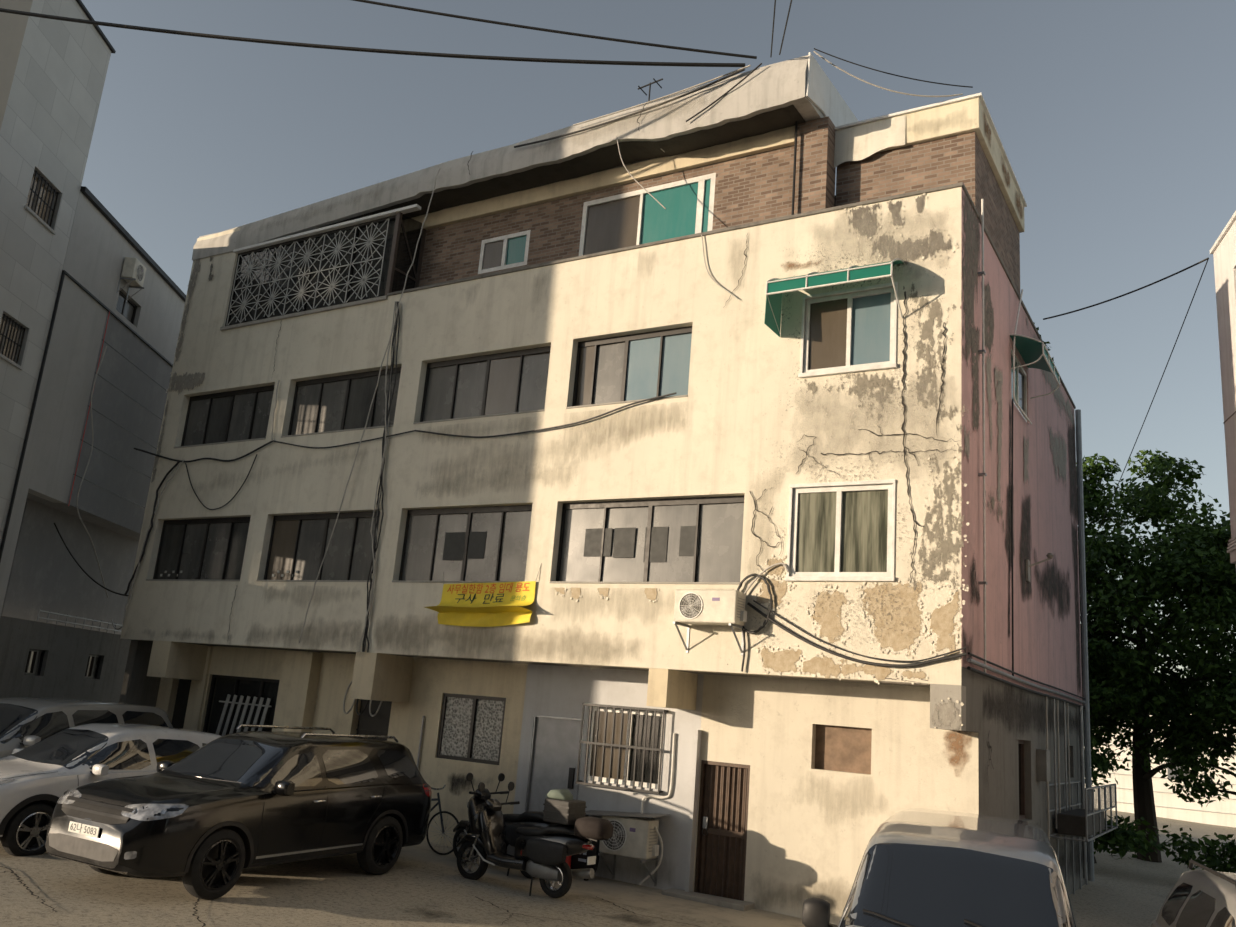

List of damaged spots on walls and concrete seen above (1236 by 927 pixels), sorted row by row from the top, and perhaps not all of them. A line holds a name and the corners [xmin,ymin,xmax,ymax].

crack [796,291,957,583]
peeling [844,191,1005,530]
peeling [1041,370,1075,490]
crack [749,489,782,571]
peeling [752,522,969,685]
water stain [984,687,1079,735]